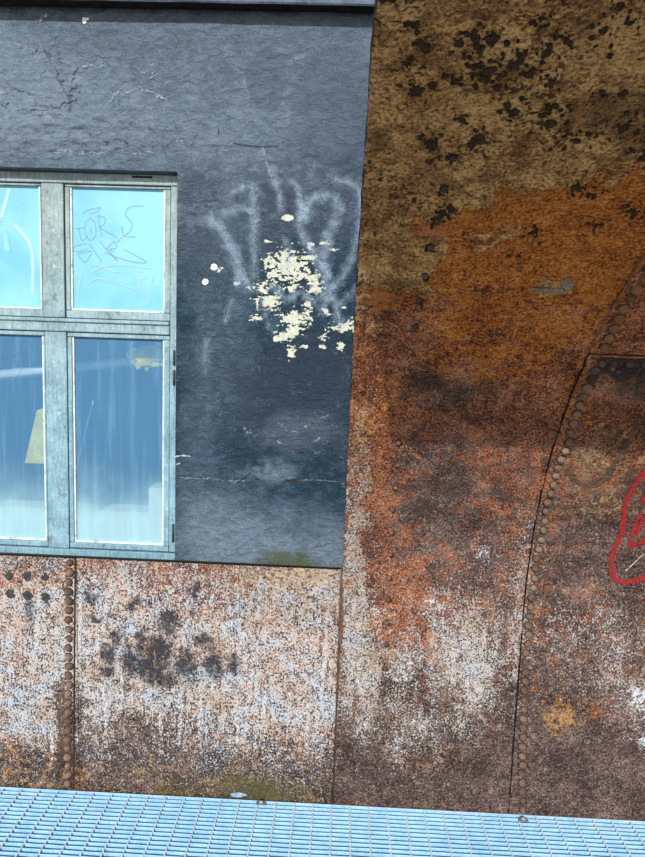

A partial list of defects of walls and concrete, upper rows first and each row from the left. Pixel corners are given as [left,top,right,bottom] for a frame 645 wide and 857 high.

crack [0,50,73,122]
crack [58,140,183,155]
rust [404,224,455,239]
peeling [233,239,354,362]
leakage [100,611,179,710]
rust [335,567,344,748]
rust [538,700,605,738]